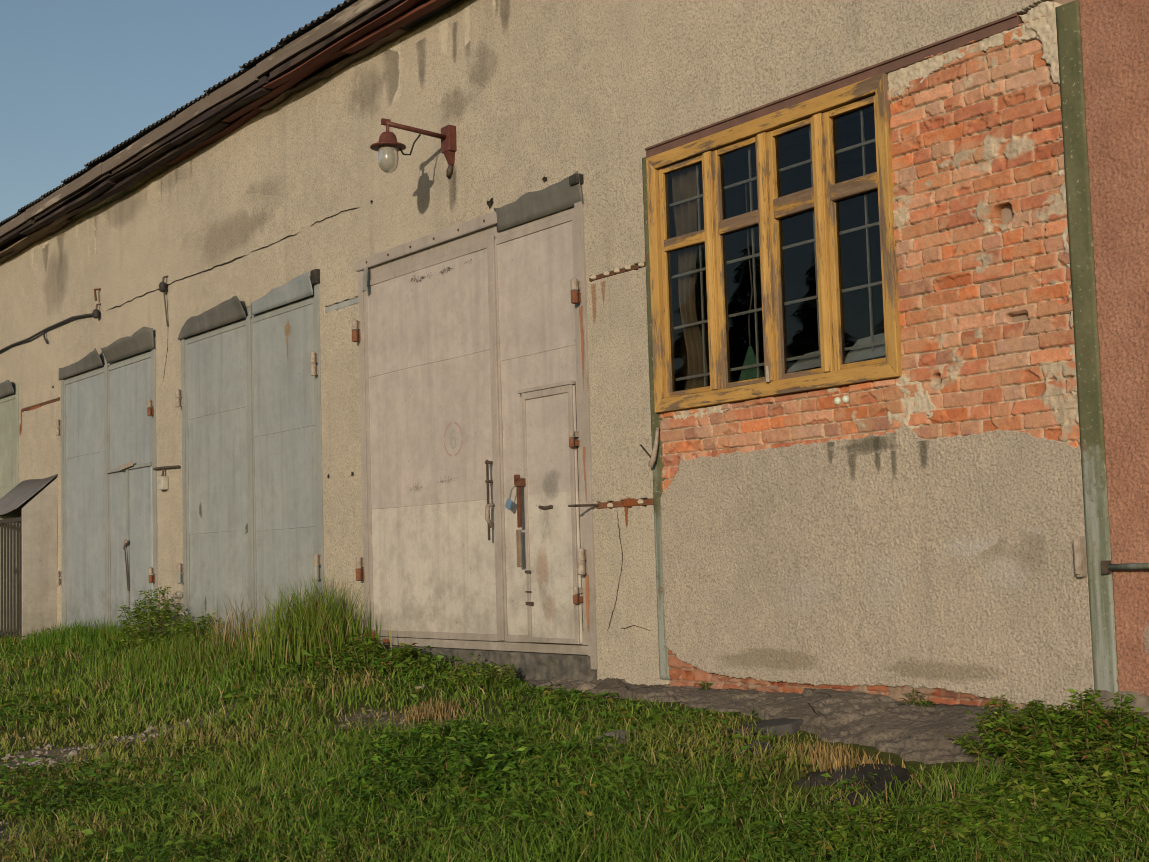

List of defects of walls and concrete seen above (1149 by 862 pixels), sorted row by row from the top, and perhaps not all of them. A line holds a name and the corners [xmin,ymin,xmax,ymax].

leakage [439,0,470,57]
leakage [385,41,401,104]
spalling [589,1,1080,509]
leakage [850,437,895,470]
rust [622,498,639,526]
spalling [668,649,1027,710]